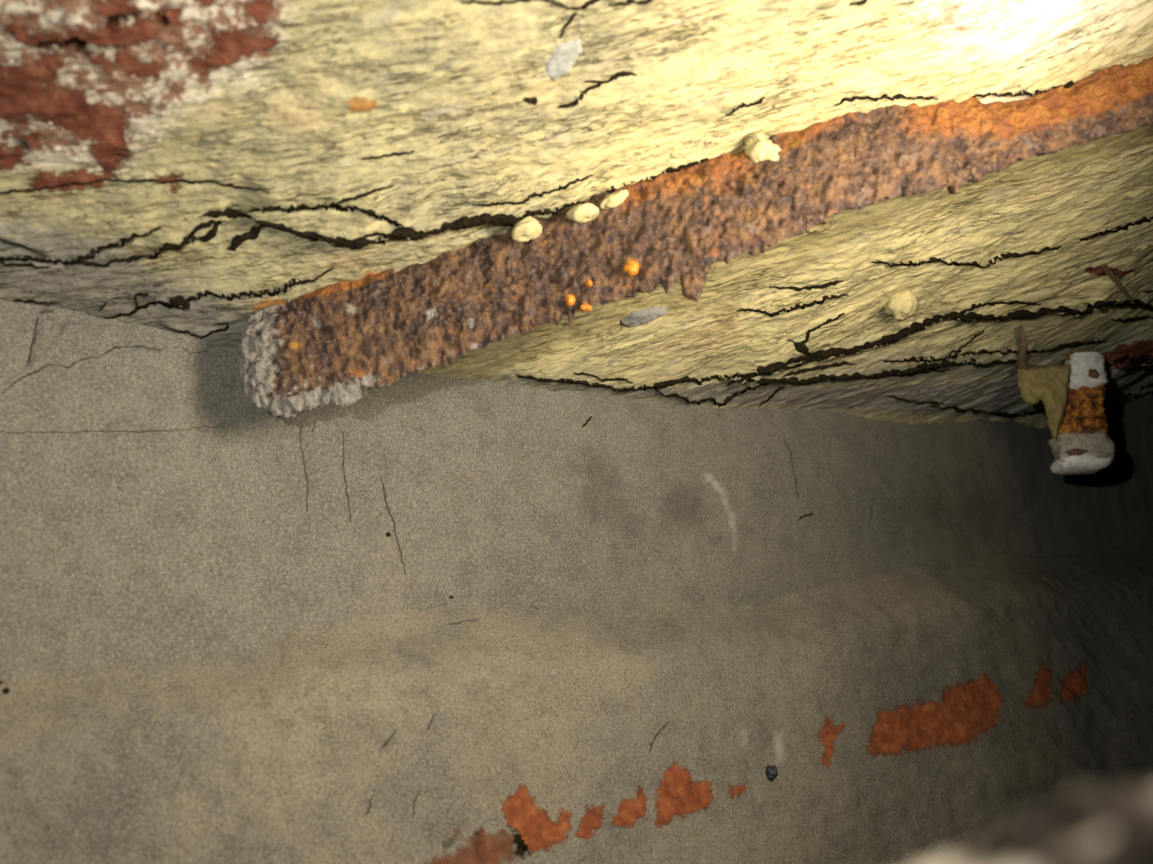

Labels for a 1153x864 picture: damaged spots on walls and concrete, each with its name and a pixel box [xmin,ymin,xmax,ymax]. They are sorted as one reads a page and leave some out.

corrosion [0,0,285,195]
crack [461,0,653,39]
peeling [545,39,583,81]
crack [557,71,638,108]
peeling [980,92,1042,104]
crack [361,150,415,160]
crack [0,157,718,394]
peeling [620,306,669,327]
corrosion [239,56,1153,418]
crack [517,280,1153,418]
corrosion [866,673,1004,758]
corrosion [431,763,713,864]